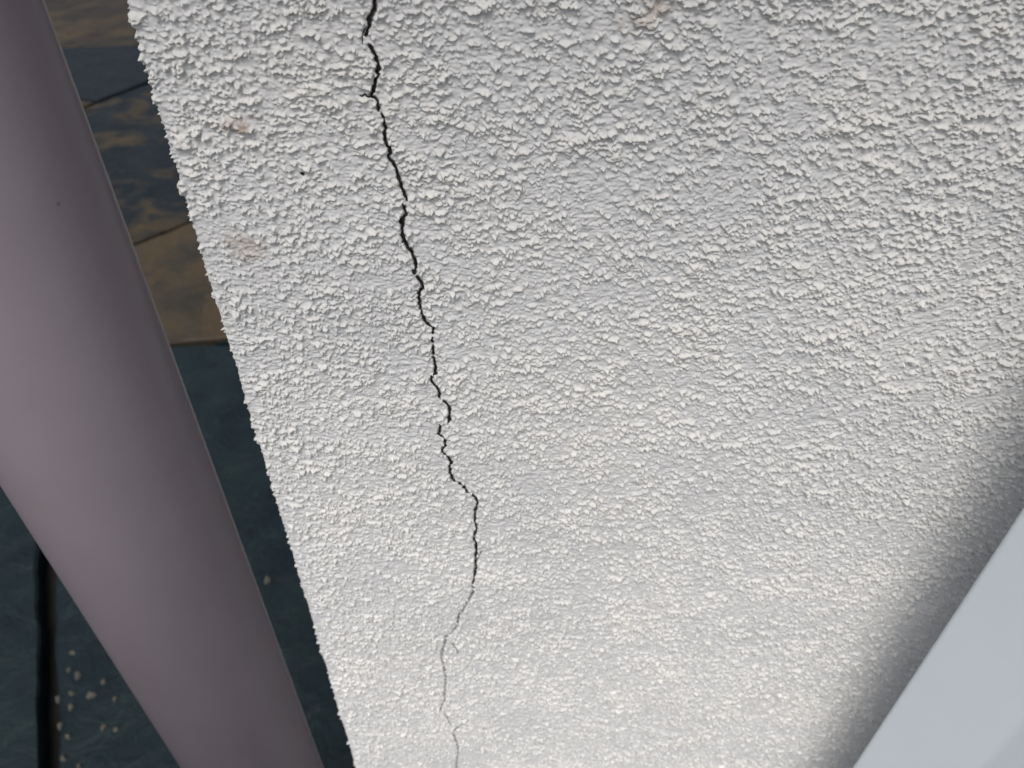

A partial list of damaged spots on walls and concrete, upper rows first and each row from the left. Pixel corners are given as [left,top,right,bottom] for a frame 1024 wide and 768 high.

crack [360,0,482,768]